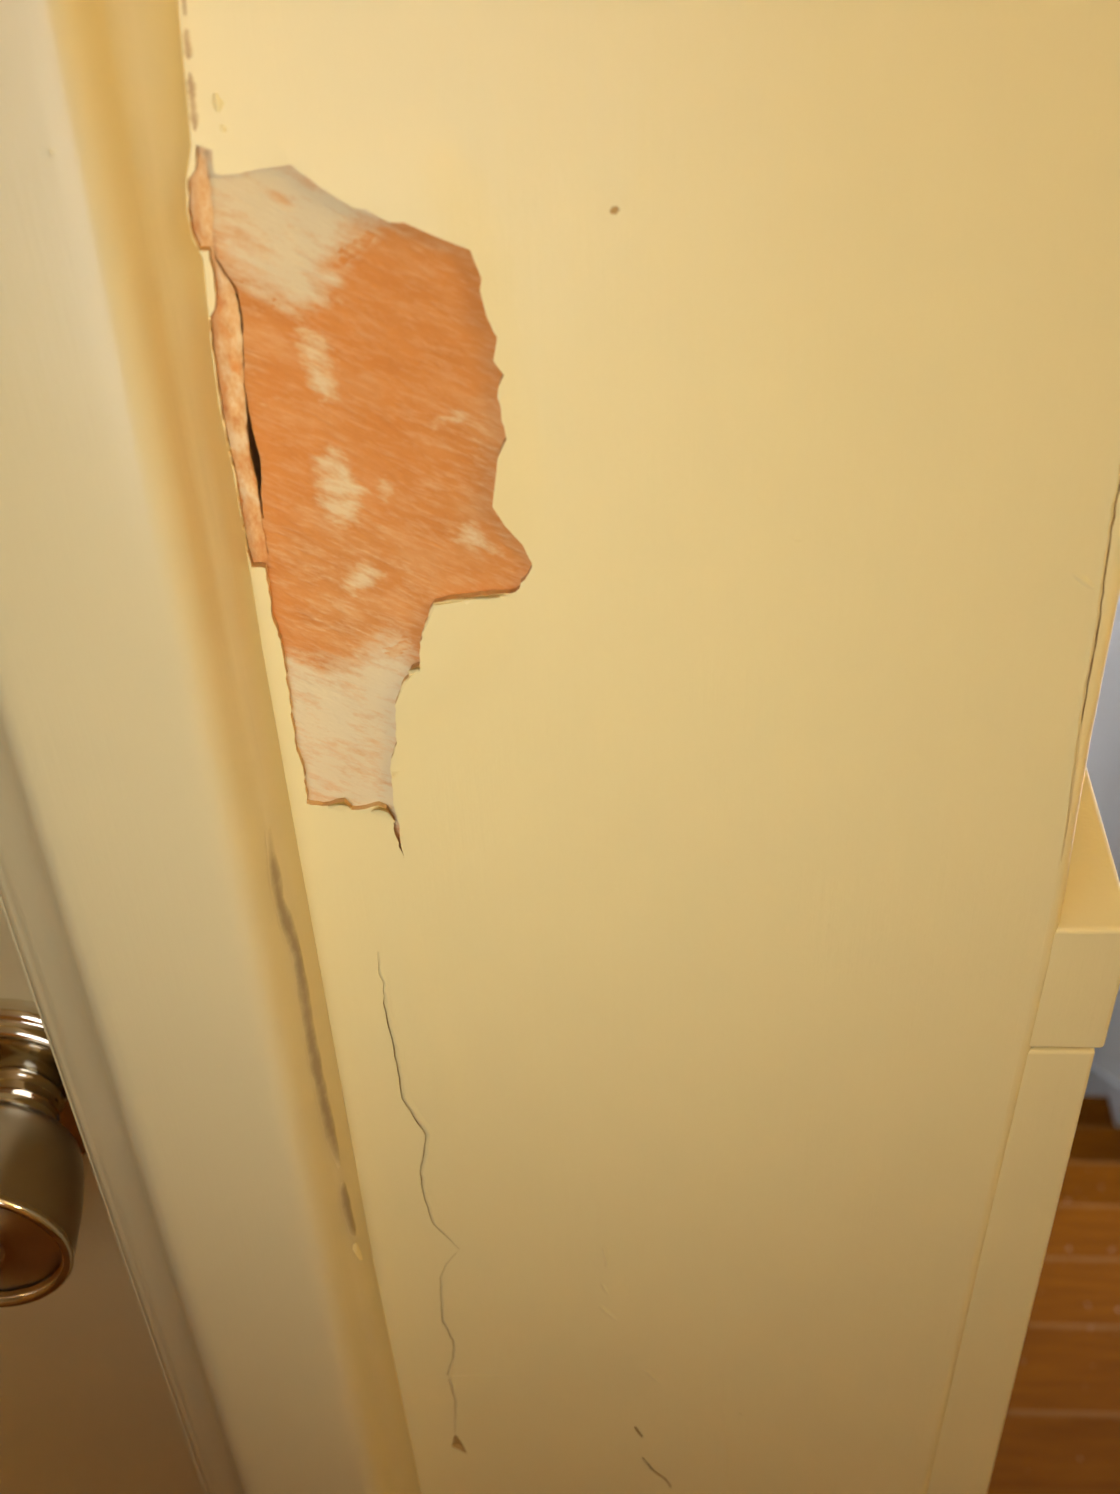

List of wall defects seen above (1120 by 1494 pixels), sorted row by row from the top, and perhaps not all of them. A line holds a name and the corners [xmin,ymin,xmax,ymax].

flaking render [188,145,532,857]
crack [378,952,467,1454]